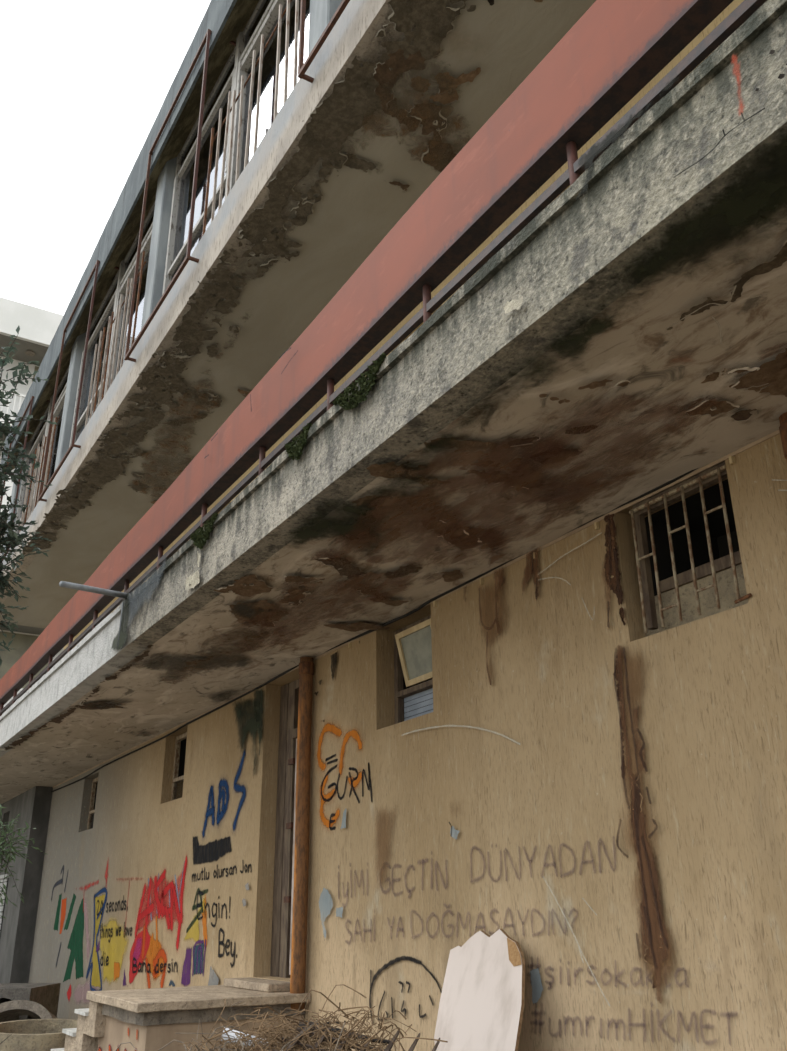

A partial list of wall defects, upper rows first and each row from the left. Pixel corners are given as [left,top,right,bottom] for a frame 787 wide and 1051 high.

water stain [578,103,651,197]
peeling [13,0,494,557]
peeling [504,296,523,314]
water stain [618,136,787,344]
peeling [578,379,631,390]
peeling [686,400,757,422]
water stain [119,308,720,685]
water stain [111,563,164,650]
peeling [435,570,463,582]
water stain [314,652,337,695]
water stain [210,690,263,772]
rust [613,645,673,1003]